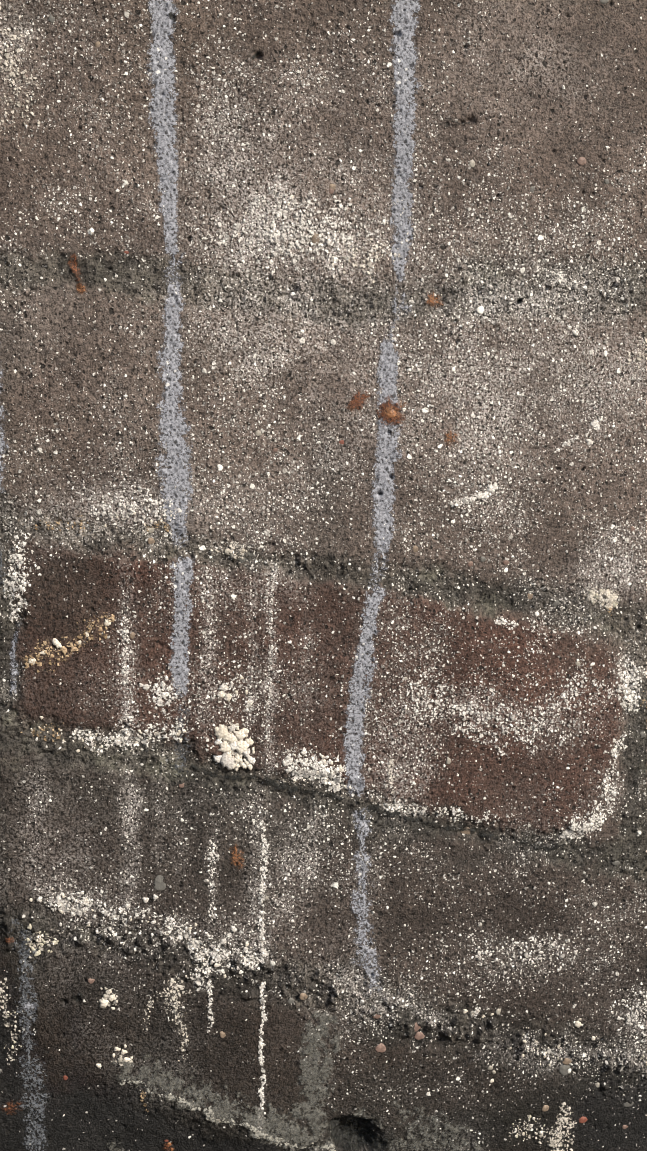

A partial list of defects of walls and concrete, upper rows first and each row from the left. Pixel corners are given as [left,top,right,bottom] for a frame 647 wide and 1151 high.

rust [348,391,370,410]
rust [377,396,406,425]
leakage [0,0,496,993]
efflorescence [388,652,647,756]
efflorescence [560,732,628,844]
leakage [0,822,277,1151]